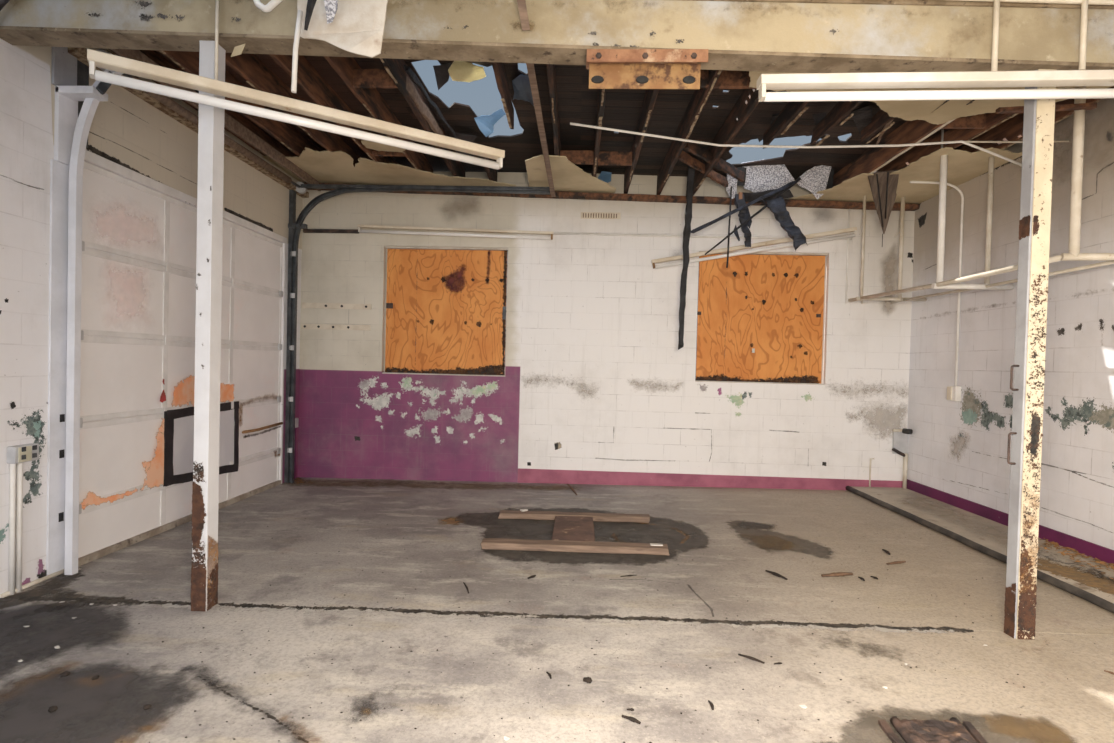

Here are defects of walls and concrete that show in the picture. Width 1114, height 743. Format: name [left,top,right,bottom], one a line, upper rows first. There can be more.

peeling [356,375,502,445]
peeling [953,385,1013,457]
peeling [1045,396,1114,436]
peeling [7,402,47,508]
rust [191,481,206,546]
leakage [728,521,832,558]
peeling [22,559,47,585]
rust [191,562,218,612]
crack [18,579,974,634]
rust [1004,523,1037,640]
leakage [828,708,1074,743]